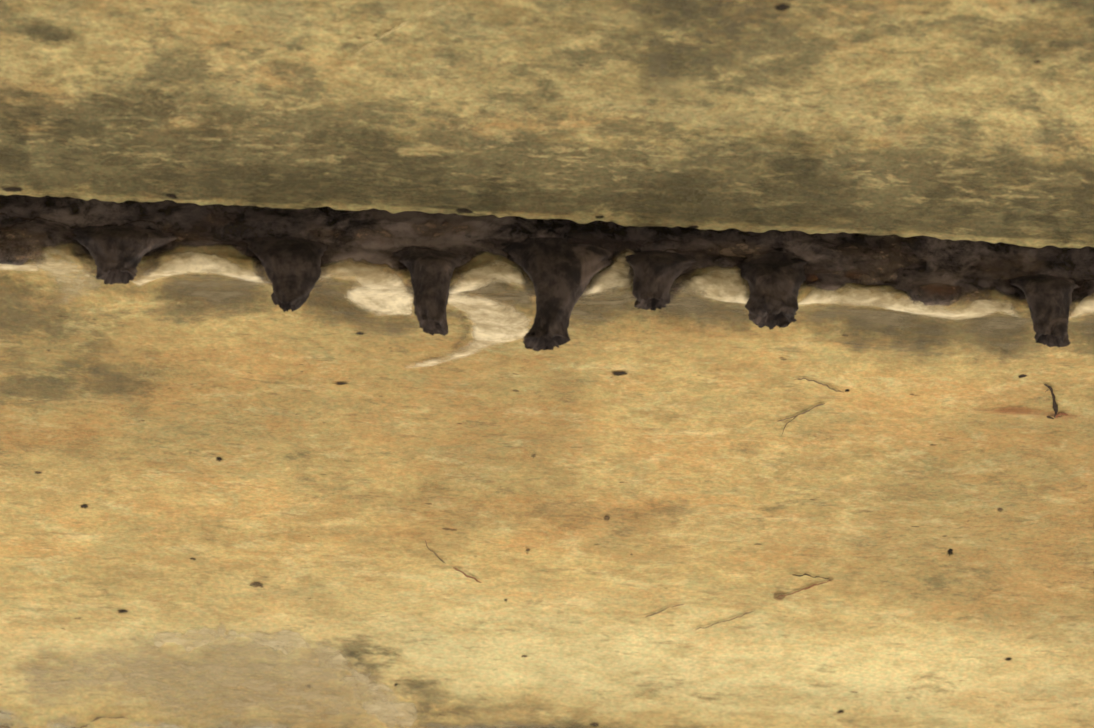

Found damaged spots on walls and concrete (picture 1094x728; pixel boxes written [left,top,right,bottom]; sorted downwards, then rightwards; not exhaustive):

leakage [0,228,97,291]
leakage [135,232,272,309]
leakage [310,227,414,333]
leakage [414,221,535,358]
leakage [567,239,641,324]
leakage [665,243,764,322]
leakage [798,262,1031,351]
leakage [1069,283,1094,336]